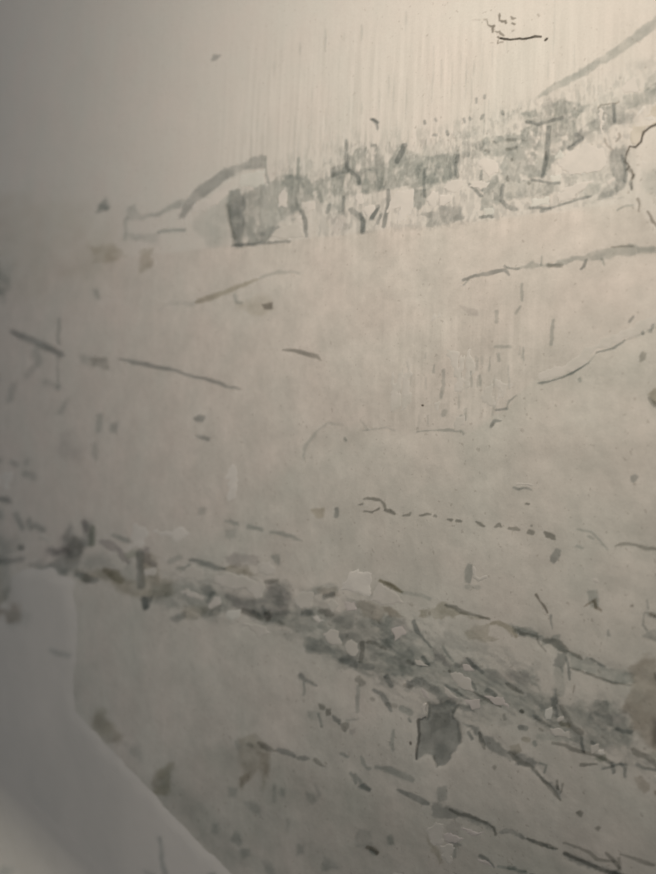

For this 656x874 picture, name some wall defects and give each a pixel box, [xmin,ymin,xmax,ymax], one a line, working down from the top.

crack [500,34,548,42]
crack [629,105,656,147]
peeling [531,108,608,207]
peeling [191,169,267,213]
peeling [277,187,289,208]
peeling [271,201,316,240]
peeling [355,188,415,225]
peeling [426,158,499,209]
flaking render [176,561,276,638]
flaking render [294,569,404,657]
flaking render [442,664,509,711]
flaking render [544,707,571,739]